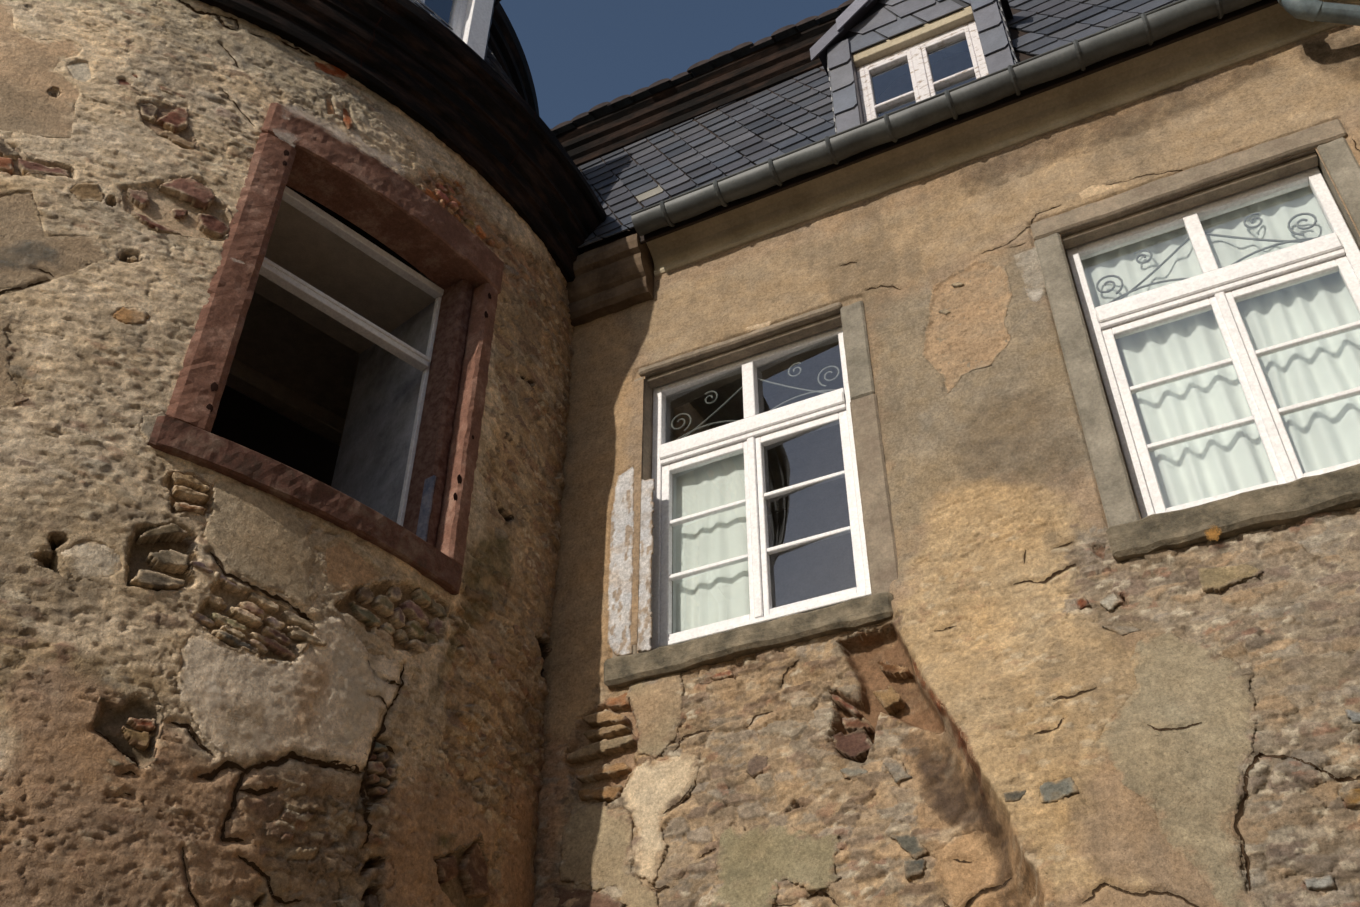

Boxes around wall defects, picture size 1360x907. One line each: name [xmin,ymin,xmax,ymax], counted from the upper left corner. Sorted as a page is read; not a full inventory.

peeling [0,0,104,202]
spalling [120,174,233,241]
spalling [92,693,164,769]
crack [171,660,404,907]
peeling [126,469,451,806]
peeling [554,692,660,907]
peeling [607,467,655,656]
spalling [829,621,946,780]
peeling [889,831,1005,906]
crack [1082,882,1199,907]
peeling [1074,592,1267,907]
crack [1234,752,1360,891]